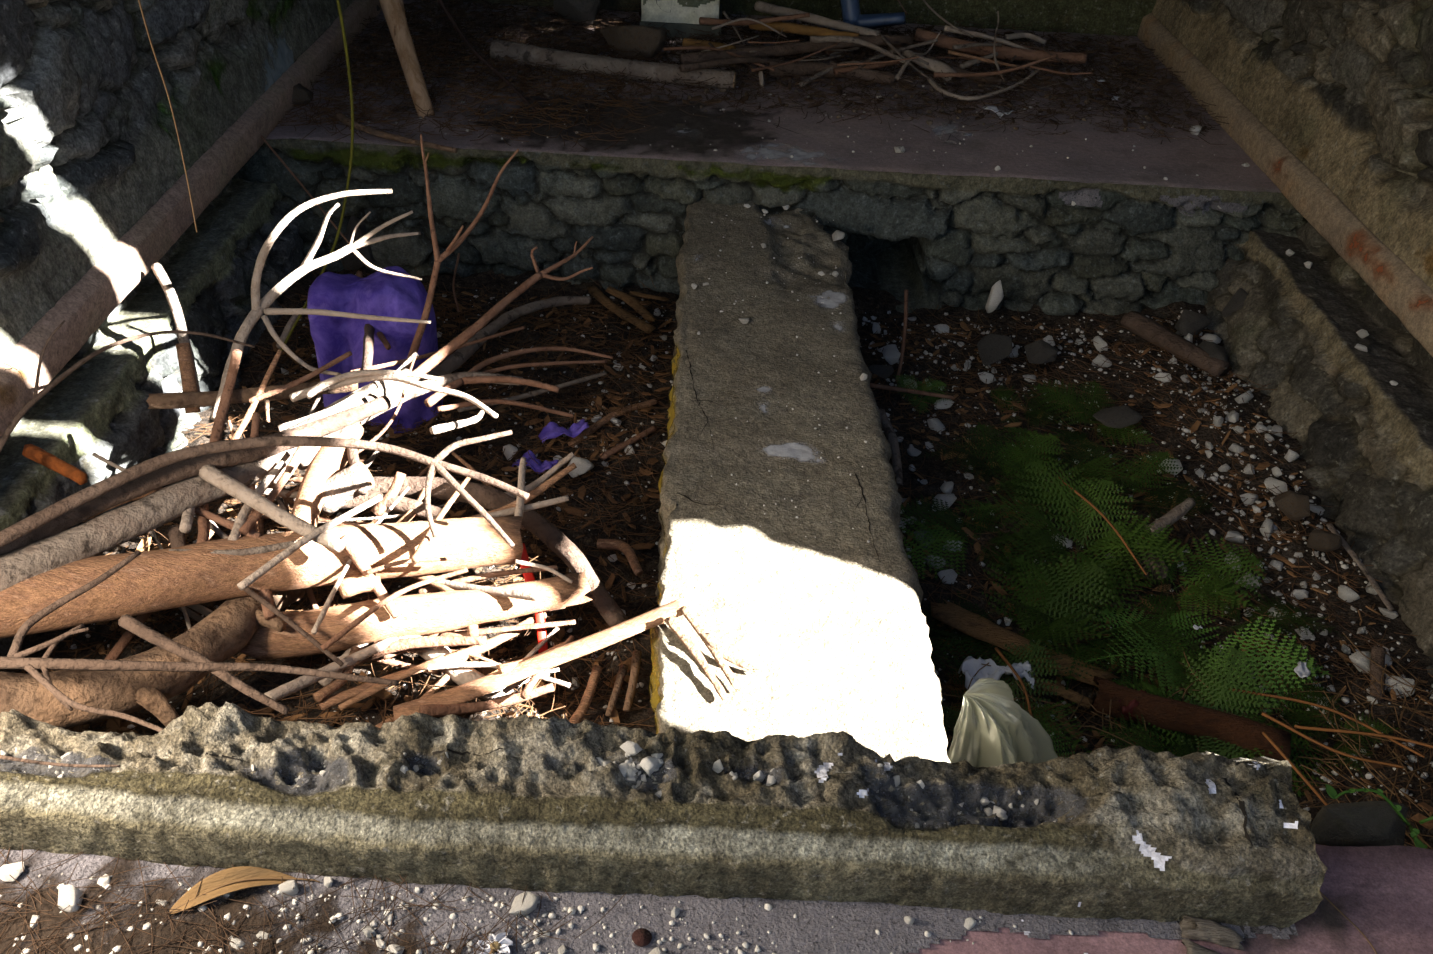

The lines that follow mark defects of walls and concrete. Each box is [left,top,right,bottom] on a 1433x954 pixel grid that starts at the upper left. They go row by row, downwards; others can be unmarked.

peeling [677,0,715,8]
crack [855,474,893,561]